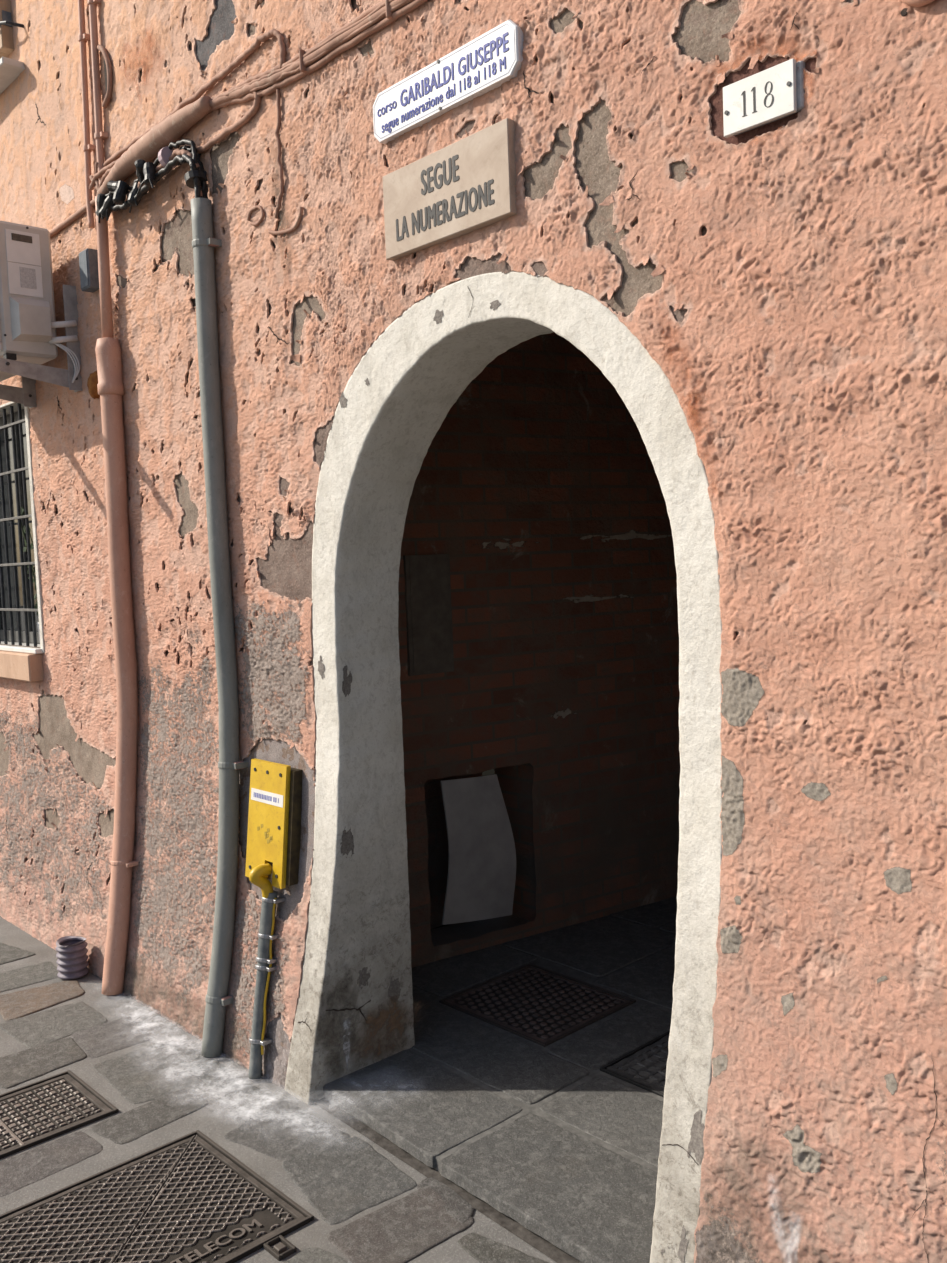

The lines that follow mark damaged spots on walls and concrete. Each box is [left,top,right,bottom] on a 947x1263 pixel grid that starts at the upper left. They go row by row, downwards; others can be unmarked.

peeling [191,0,256,79]
peeling [673,0,820,145]
peeling [159,208,194,283]
peeling [518,99,665,317]
peeling [287,293,328,366]
flaking render [234,477,314,749]
peeling [721,668,764,727]
flaking render [0,691,116,934]
peeling [720,755,745,856]
flaking render [677,1188,762,1263]